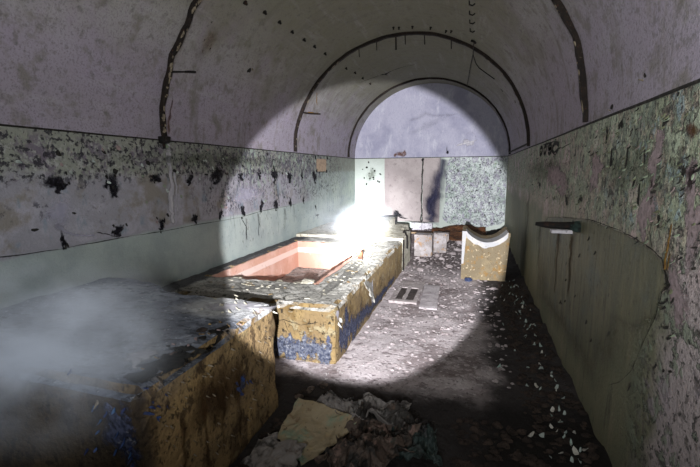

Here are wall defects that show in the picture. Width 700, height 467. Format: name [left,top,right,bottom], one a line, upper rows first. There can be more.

damp [154,144,178,231]
spalling [320,254,375,303]